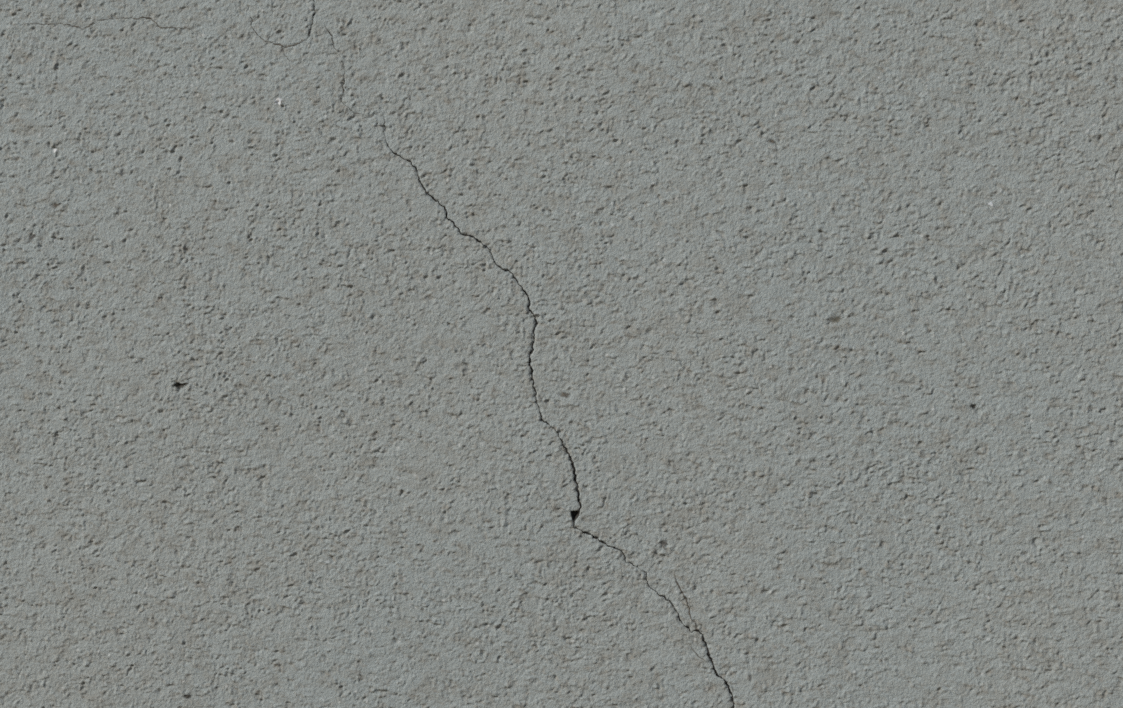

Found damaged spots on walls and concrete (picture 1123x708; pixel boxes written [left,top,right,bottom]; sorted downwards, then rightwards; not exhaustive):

crack [250,0,734,708]